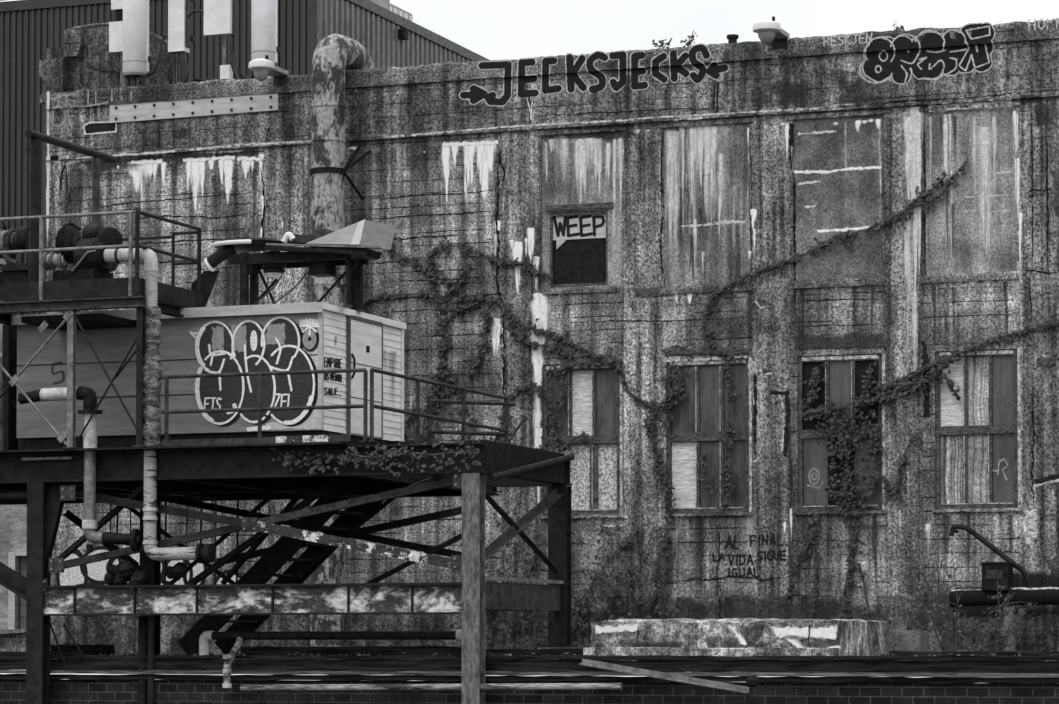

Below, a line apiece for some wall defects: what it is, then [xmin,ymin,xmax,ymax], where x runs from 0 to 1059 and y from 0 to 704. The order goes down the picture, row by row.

leakage [46,91,61,240]
leakage [66,149,264,238]
leakage [281,154,304,247]
leakage [442,140,498,203]
leakage [545,124,649,236]
leakage [667,117,734,268]
crack [369,90,1057,408]
leakage [748,209,757,258]
crack [1029,387,1037,506]